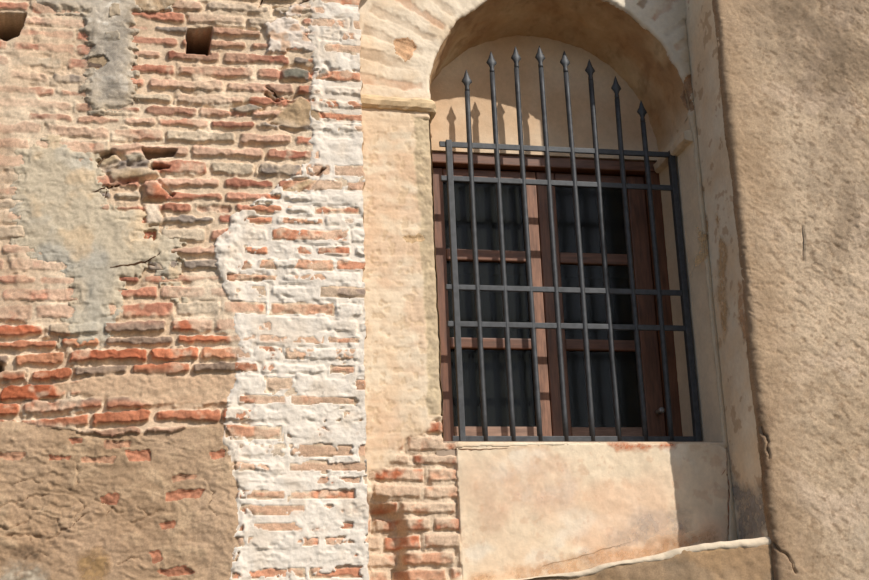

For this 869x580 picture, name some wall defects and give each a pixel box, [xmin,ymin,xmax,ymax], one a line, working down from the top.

spalling [135,0,177,13]
peeling [209,0,461,580]